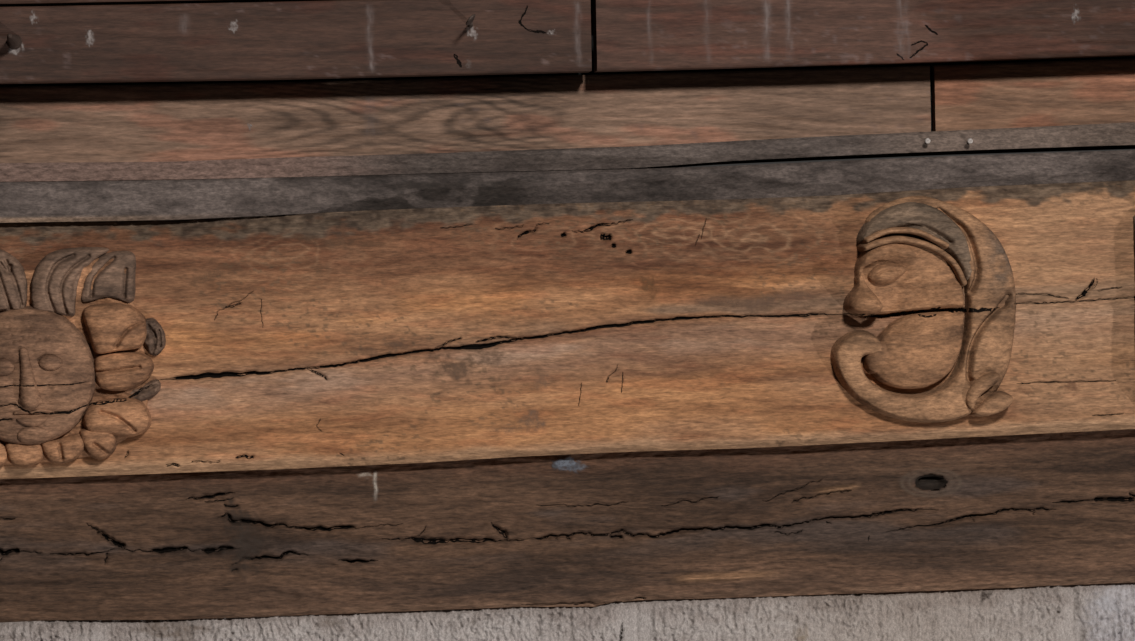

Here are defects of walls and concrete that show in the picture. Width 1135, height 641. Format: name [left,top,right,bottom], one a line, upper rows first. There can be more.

crack [0,287,1135,421]
crack [165,454,254,467]
crack [0,479,1135,573]